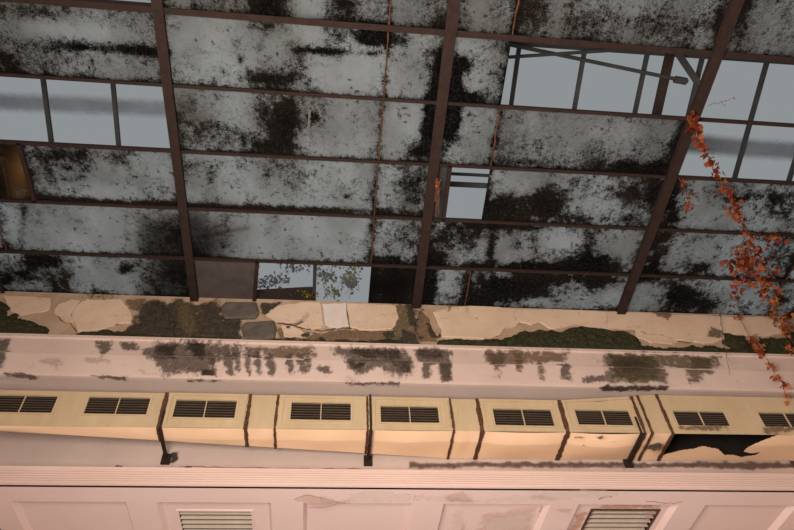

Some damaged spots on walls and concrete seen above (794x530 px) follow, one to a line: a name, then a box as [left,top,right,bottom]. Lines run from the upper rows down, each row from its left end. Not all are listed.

damp [0,339,37,380]
peeling [3,295,145,333]
damp [95,299,331,382]
peeling [221,302,399,342]
damp [333,304,452,386]
damp [485,349,571,380]
peeling [414,306,786,345]
damp [582,353,668,392]